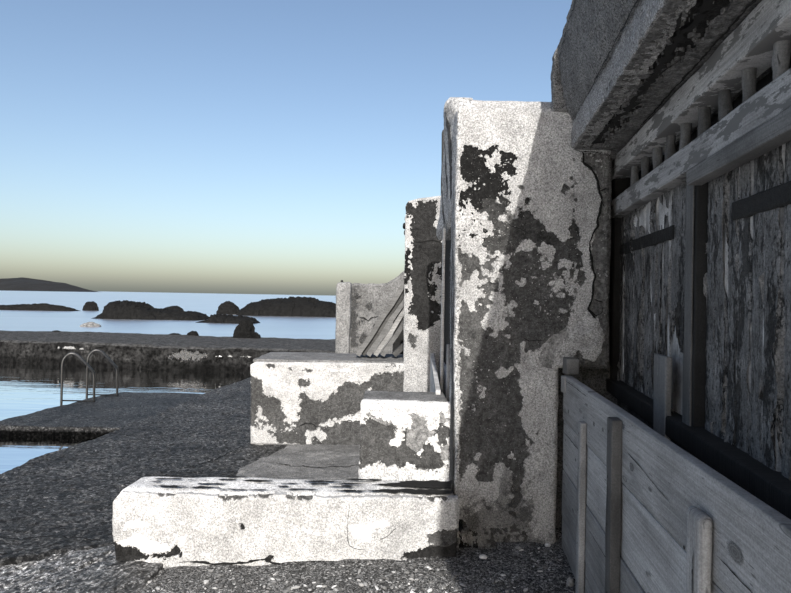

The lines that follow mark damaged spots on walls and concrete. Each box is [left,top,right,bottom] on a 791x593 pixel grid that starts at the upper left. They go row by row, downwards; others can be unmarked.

flaking render [572,0,731,168]
flaking render [250,176,608,559]
spalling [218,494,273,502]